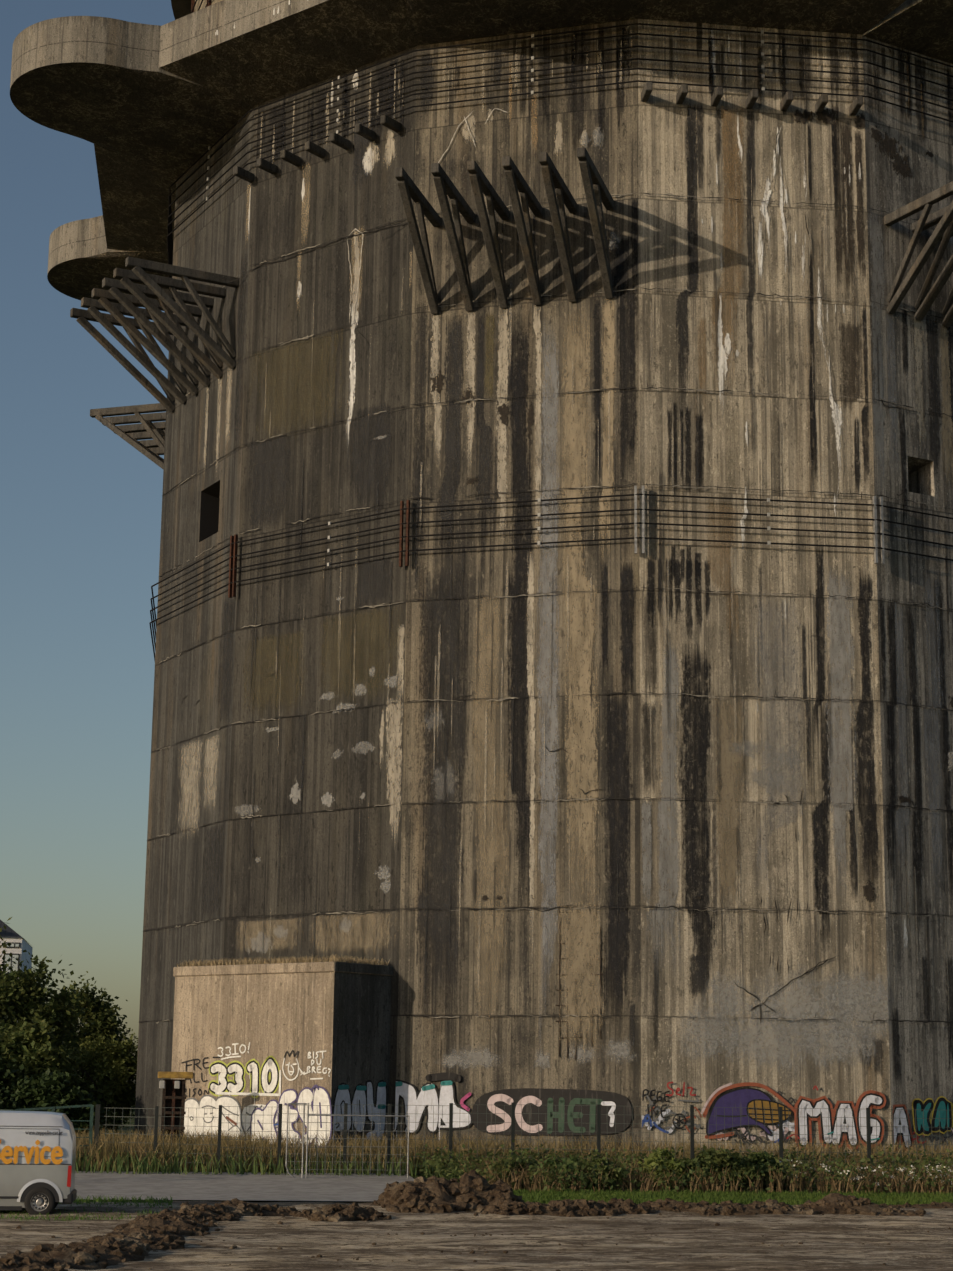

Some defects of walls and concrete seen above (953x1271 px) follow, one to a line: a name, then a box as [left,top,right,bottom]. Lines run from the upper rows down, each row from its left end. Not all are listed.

damp [348,22,953,1065]
peeling [320,667,398,713]
peeling [289,781,301,805]
peeling [321,792,332,807]
peeling [375,865,391,893]
damp [857,1012,901,1079]